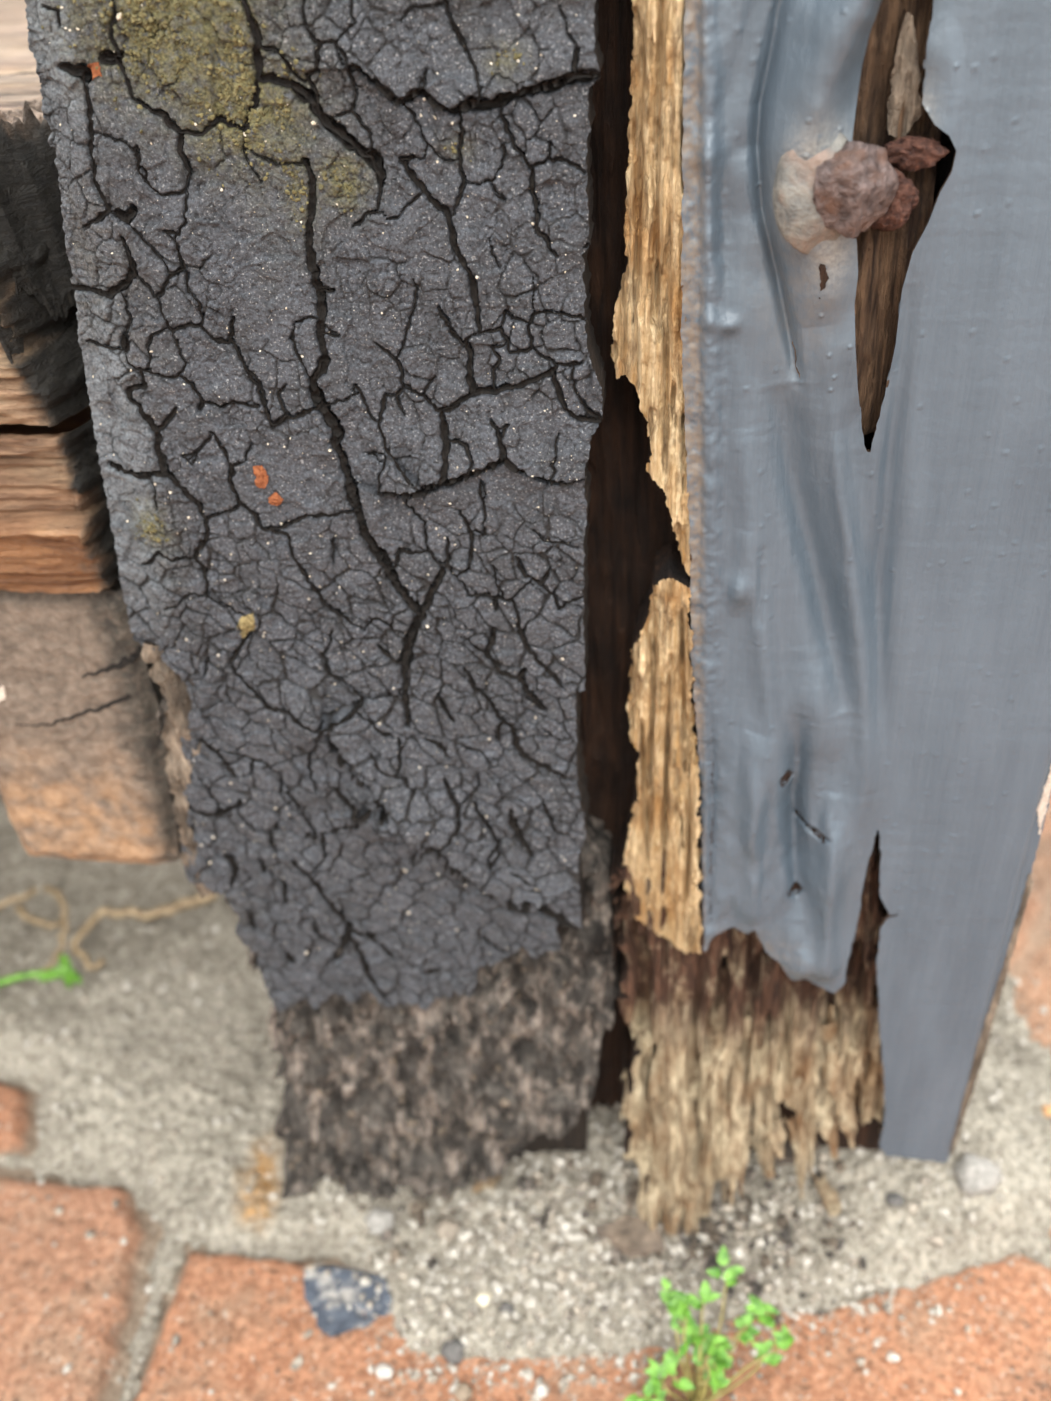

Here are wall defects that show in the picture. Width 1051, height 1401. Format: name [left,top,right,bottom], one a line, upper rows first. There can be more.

crack [43,6,61,27]
spalling [852,0,942,147]
spalling [855,161,938,435]
rust [253,465,284,506]
crack [59,0,601,1001]